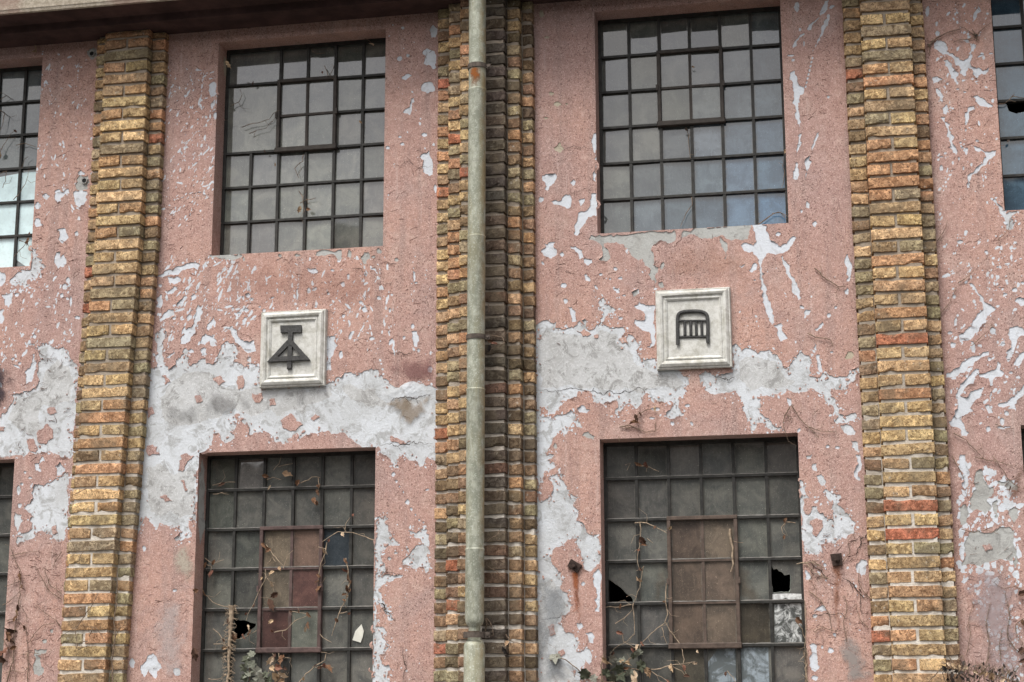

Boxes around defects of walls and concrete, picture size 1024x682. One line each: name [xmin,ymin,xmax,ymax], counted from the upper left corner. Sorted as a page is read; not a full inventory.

peeling [925,3,996,188]
peeling [988,194,1021,232]
peeling [0,334,79,547]
peeling [137,248,437,551]
peeling [535,133,862,682]
peeling [944,281,1024,436]
flaking render [959,455,1019,567]
peeling [129,654,181,679]
peeling [368,512,435,682]